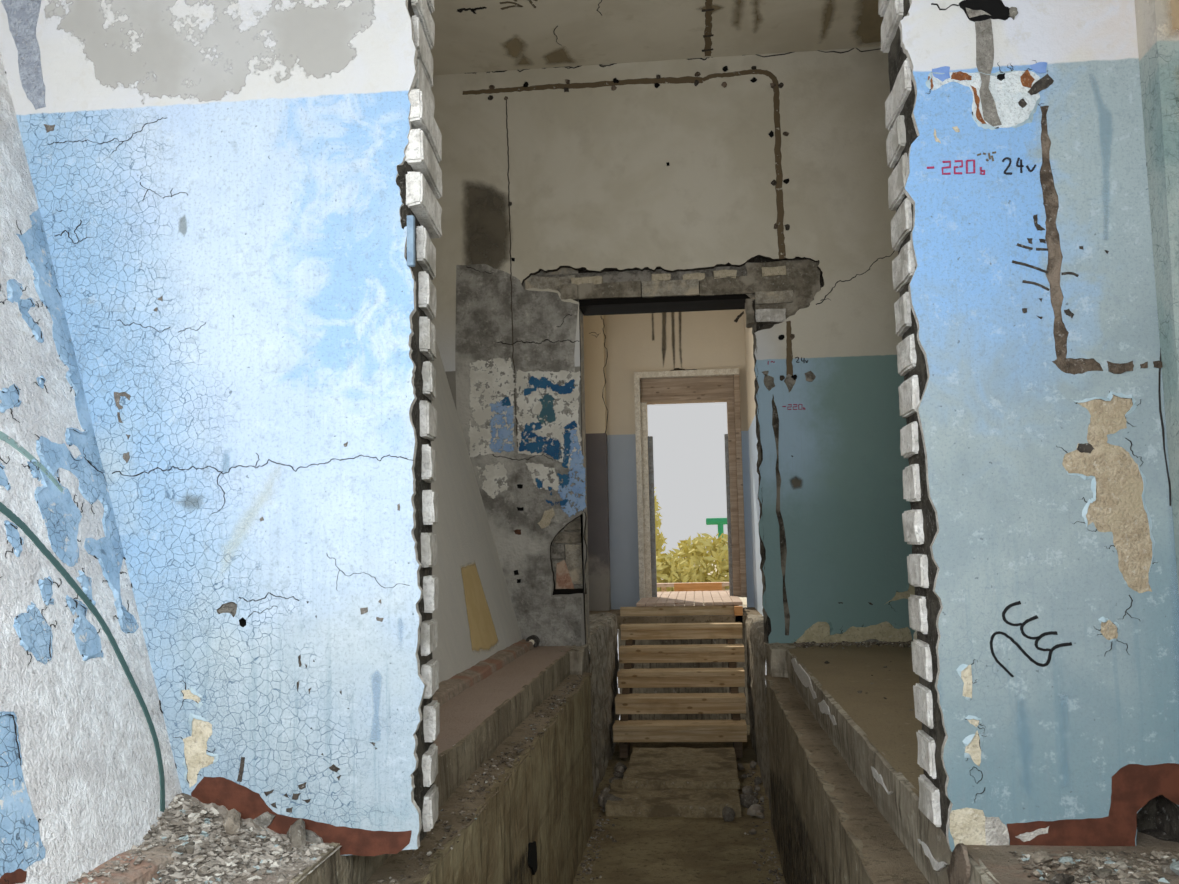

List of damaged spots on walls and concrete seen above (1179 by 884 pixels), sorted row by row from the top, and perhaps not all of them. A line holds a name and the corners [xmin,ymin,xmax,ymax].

peeling [1,0,375,110]
damp [505,38,529,64]
damp [545,49,572,63]
damp [855,0,884,43]
crack [49,117,166,153]
crack [140,182,188,200]
crack [54,210,88,244]
peeling [0,208,139,665]
crack [112,453,414,514]
spalling [396,0,442,855]
flaking render [455,264,583,646]
spalling [791,0,1054,884]